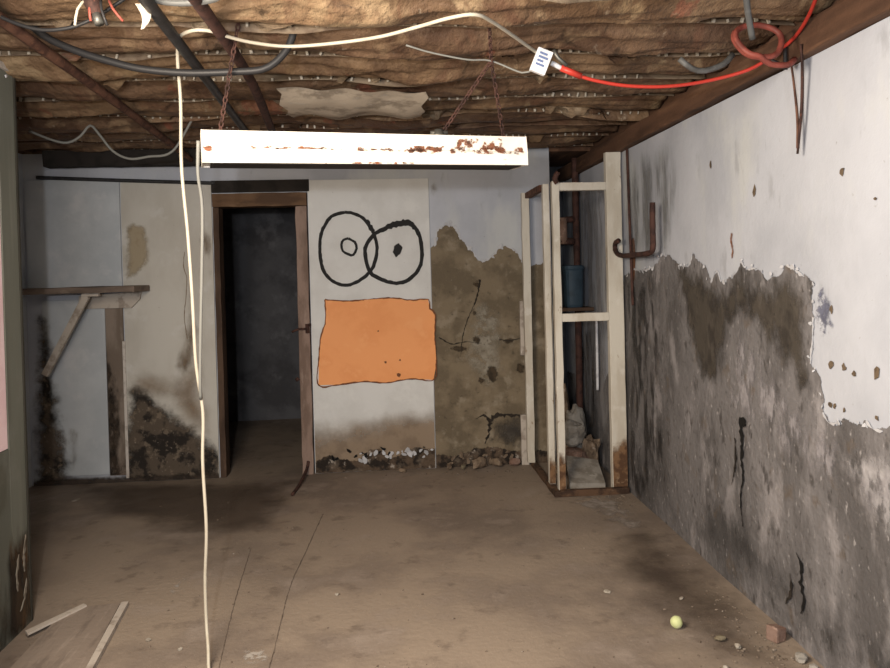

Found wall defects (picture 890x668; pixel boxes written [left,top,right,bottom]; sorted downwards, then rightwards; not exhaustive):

rust [355,138,523,164]
damp [96,364,277,527]
damp [181,327,193,369]
peeling [316,221,556,473]
crack [439,279,481,357]
peeling [567,332,611,474]
peeling [623,252,890,668]